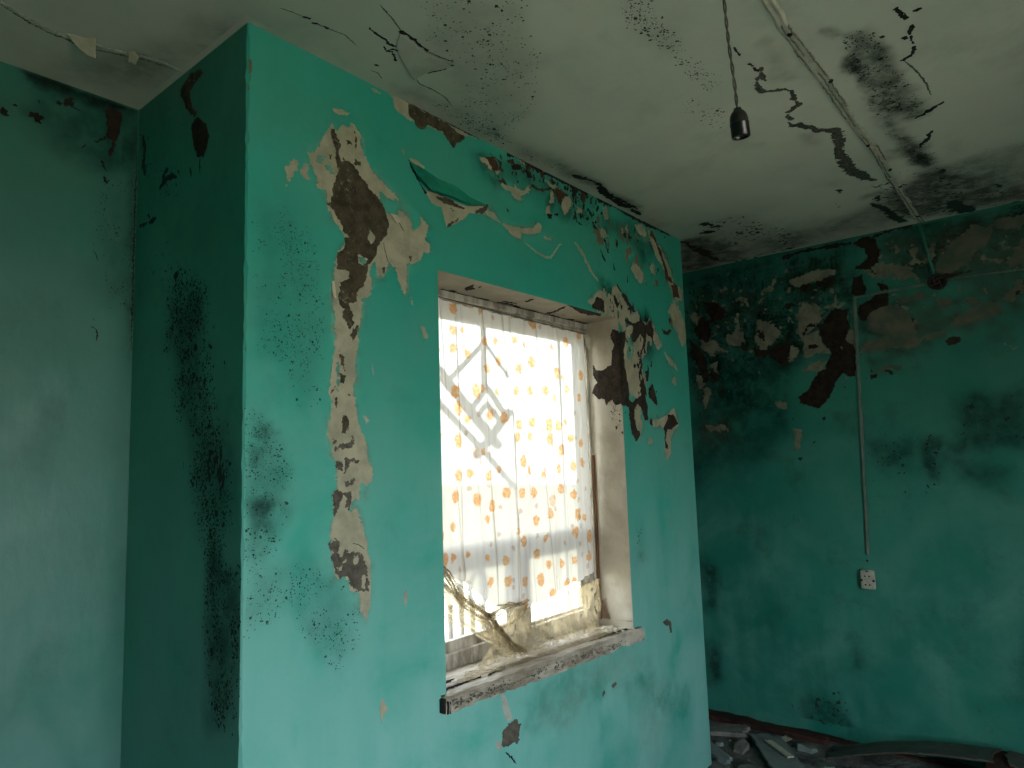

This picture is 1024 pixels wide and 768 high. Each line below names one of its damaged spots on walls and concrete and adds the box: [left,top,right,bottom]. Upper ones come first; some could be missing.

spalling [82,107,122,171]
spalling [180,69,209,175]
crack [281,8,405,78]
peeling [371,88,478,148]
crack [733,25,925,223]
damp [842,31,944,120]
crack [892,7,931,95]
peeling [924,214,1024,278]
peeling [480,153,961,461]
peeling [285,108,430,622]
damp [142,206,360,737]
spalling [495,694,521,763]